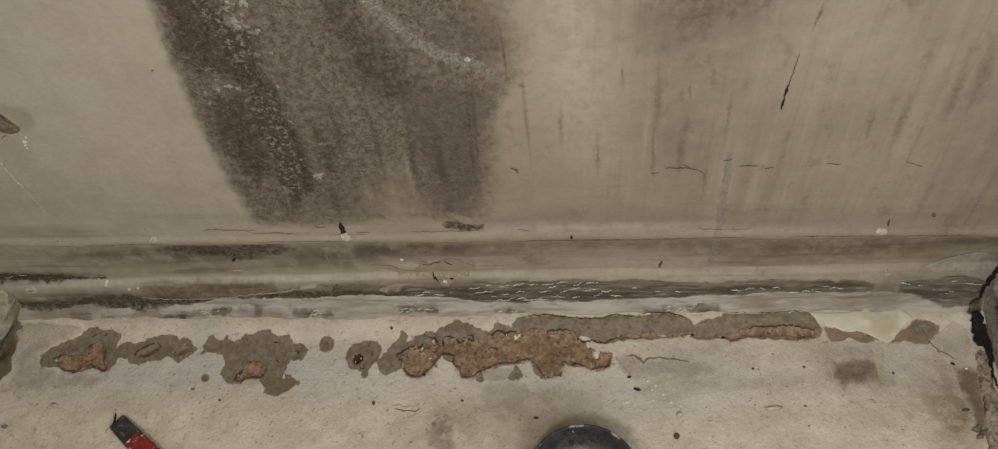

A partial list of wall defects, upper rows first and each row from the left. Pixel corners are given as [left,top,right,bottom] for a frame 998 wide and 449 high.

crack [781,54,800,110]
leakage [152,0,504,231]
spalling [0,290,15,341]
leakage [0,274,106,284]
leakage [18,295,207,311]
leakage [238,291,399,299]
crack [969,267,998,411]